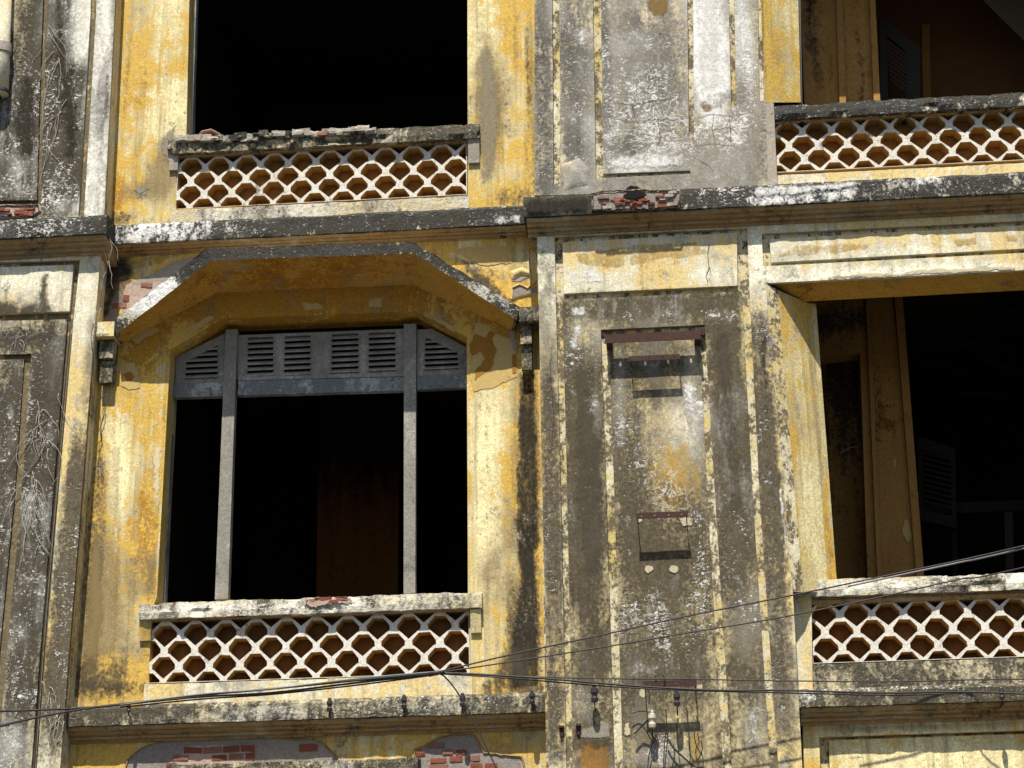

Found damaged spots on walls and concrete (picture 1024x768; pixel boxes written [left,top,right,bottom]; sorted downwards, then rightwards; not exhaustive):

water stain [56,25,77,155]
water stain [12,74,34,154]
water stain [476,46,499,182]
flaking render [590,185,682,212]
peeling [454,245,512,266]
water stain [0,274,50,313]
flaking render [103,254,196,322]
efflorescence [684,385,697,416]
water stain [494,374,540,689]
flaking render [305,596,353,608]
flaking render [125,738,338,768]
flaking render [413,733,526,768]